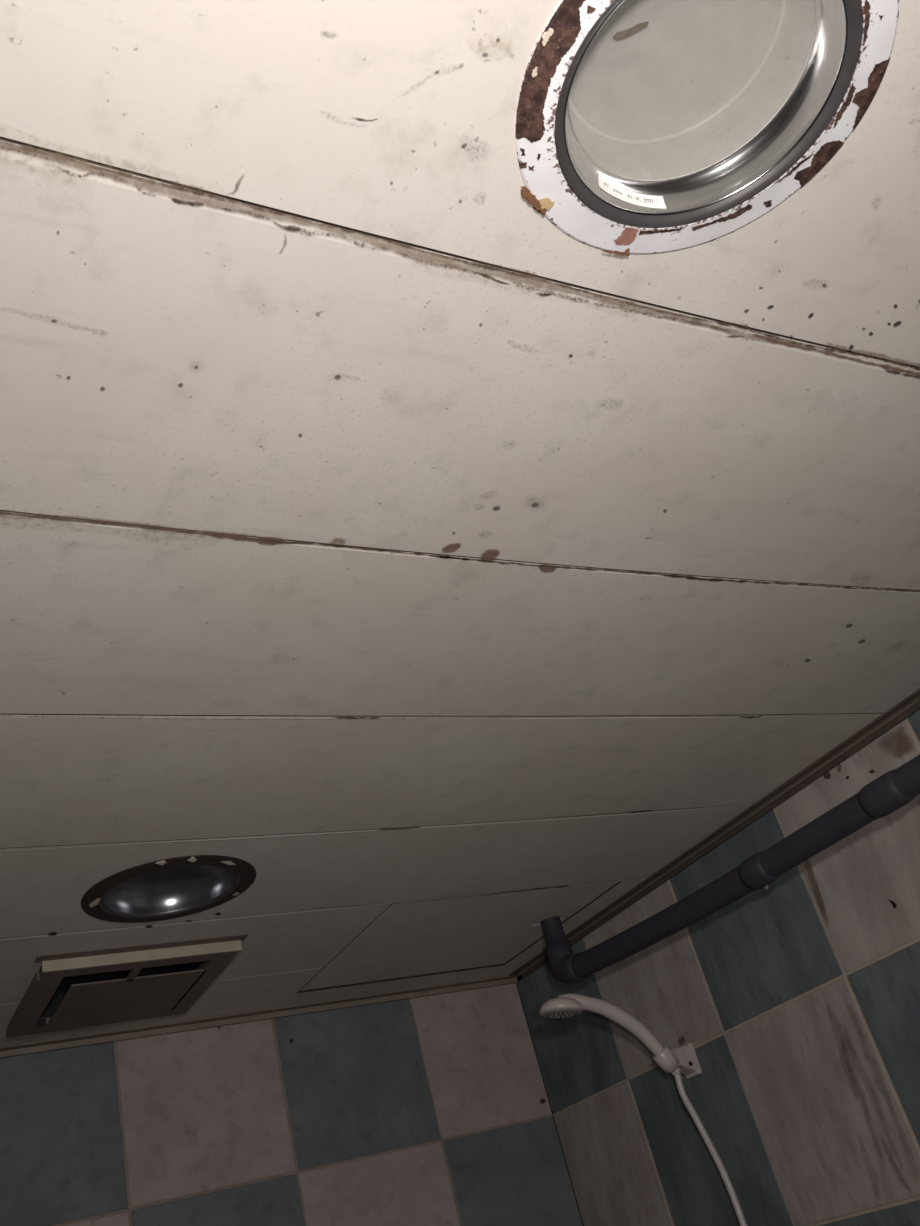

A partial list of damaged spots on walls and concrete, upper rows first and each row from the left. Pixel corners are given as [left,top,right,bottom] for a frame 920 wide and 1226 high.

peeling [542,28,554,46]
corrosion [613,21,649,41]
corrosion [863,0,884,46]
corrosion [516,0,596,171]
corrosion [521,186,547,215]
peeling [538,197,555,210]